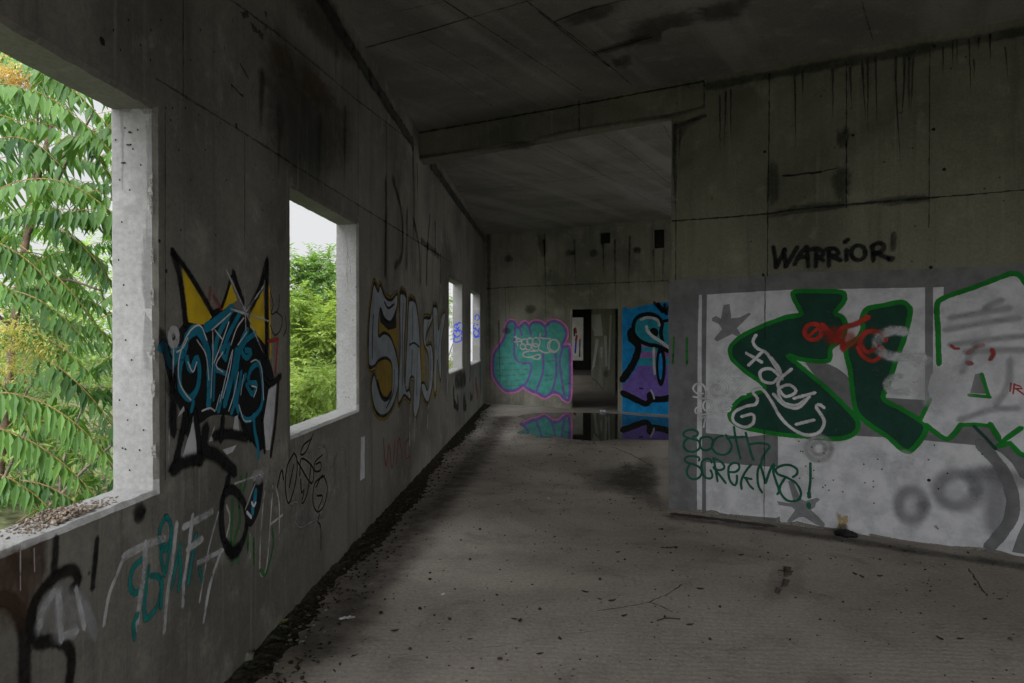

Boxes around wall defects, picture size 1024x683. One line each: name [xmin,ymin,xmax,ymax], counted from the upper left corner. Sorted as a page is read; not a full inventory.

leakage [673,28,1024,206]
crack [598,584,682,612]